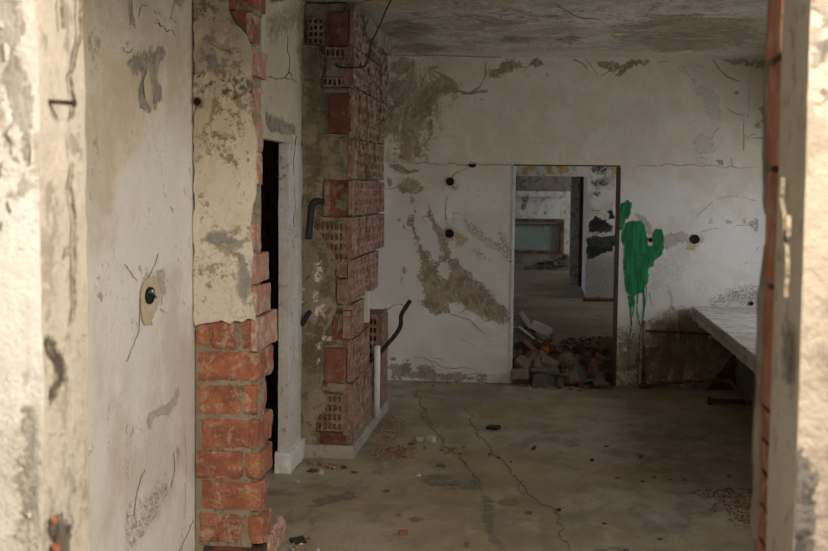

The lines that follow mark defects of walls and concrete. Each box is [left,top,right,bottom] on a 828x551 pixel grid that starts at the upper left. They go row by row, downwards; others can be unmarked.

crack [129,0,175,35]
crack [59,0,83,119]
spalling [127,45,166,113]
crack [269,36,296,83]
peeling [397,57,545,162]
peeling [573,58,669,78]
spalling [390,178,510,334]
damp [612,307,753,389]
crack [133,470,145,517]